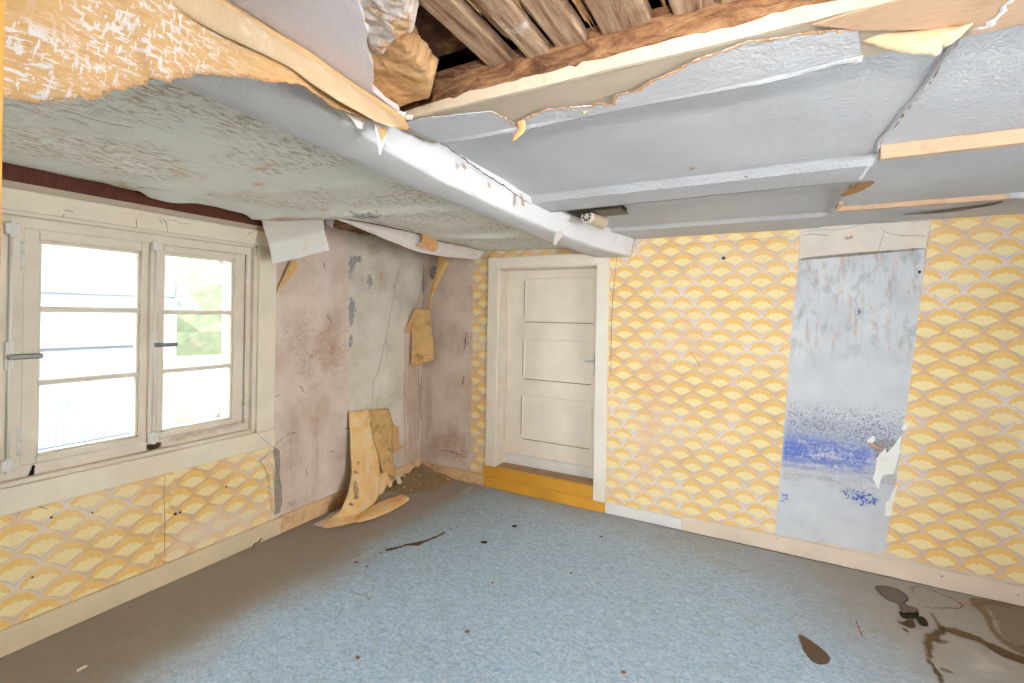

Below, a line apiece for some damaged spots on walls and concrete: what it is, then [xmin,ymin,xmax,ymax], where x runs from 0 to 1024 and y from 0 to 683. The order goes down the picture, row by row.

peeling [867,422,909,516]
damp [875,585,1024,683]